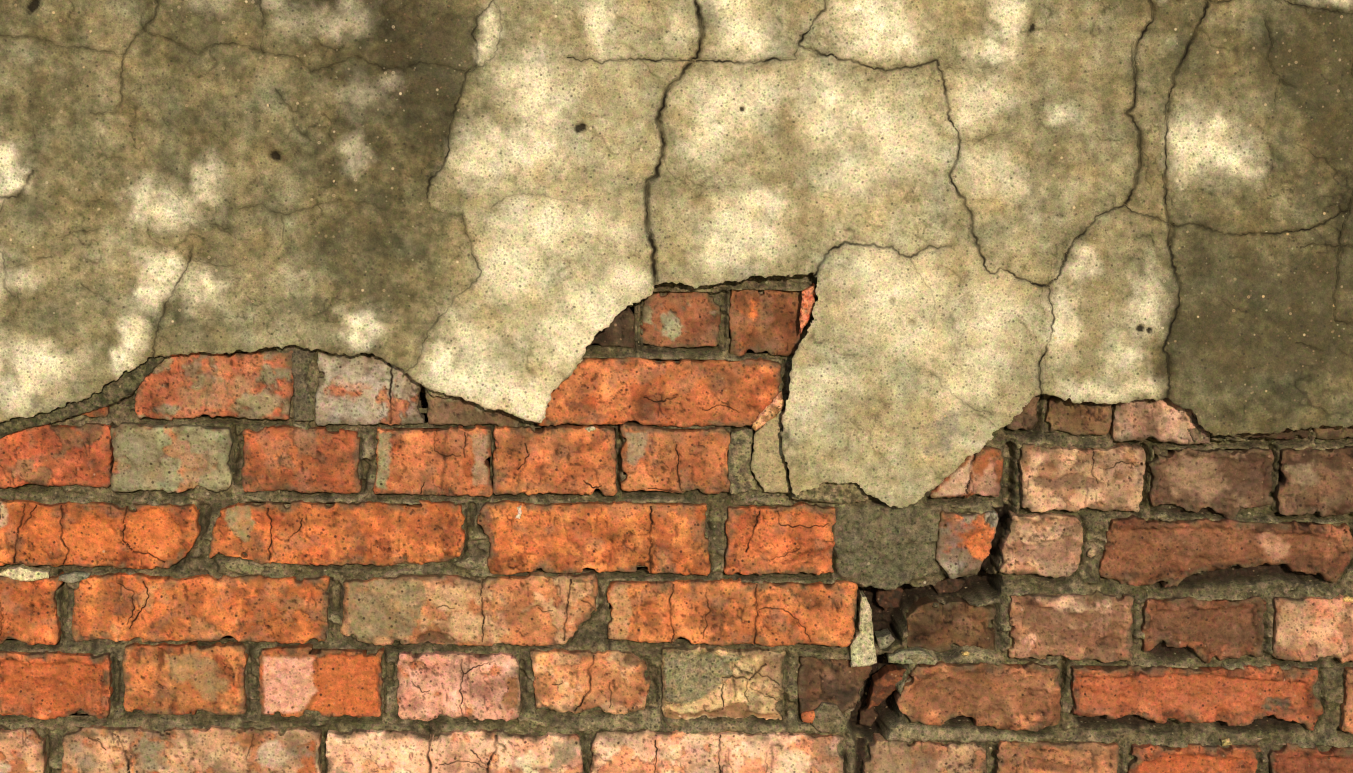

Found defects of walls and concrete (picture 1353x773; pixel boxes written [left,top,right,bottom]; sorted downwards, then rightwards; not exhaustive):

crack [0,0,503,199]
crack [0,169,35,214]
spalling [0,355,168,439]
spalling [22,505,187,557]
crack [151,174,384,357]
spalling [309,651,381,717]
crack [388,193,588,424]
spalling [727,383,869,504]
crack [847,453,1013,773]
crack [567,0,1353,416]
spalling [1074,641,1310,734]
spalling [1110,414,1341,591]